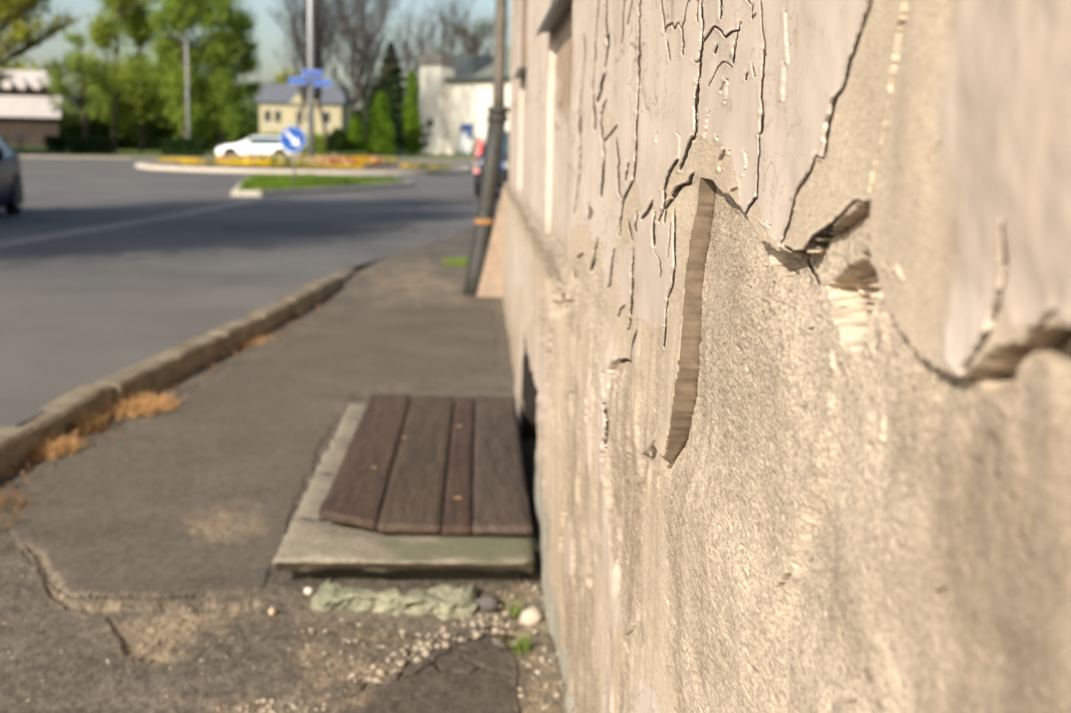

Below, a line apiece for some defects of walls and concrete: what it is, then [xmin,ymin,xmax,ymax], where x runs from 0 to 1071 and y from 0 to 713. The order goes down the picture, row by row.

crack [573,0,766,368]
crack [780,0,872,284]
crack [601,403,609,448]
spalling [601,0,1071,713]
crack [962,221,1007,373]
crack [1027,310,1057,331]
crack [389,639,512,679]